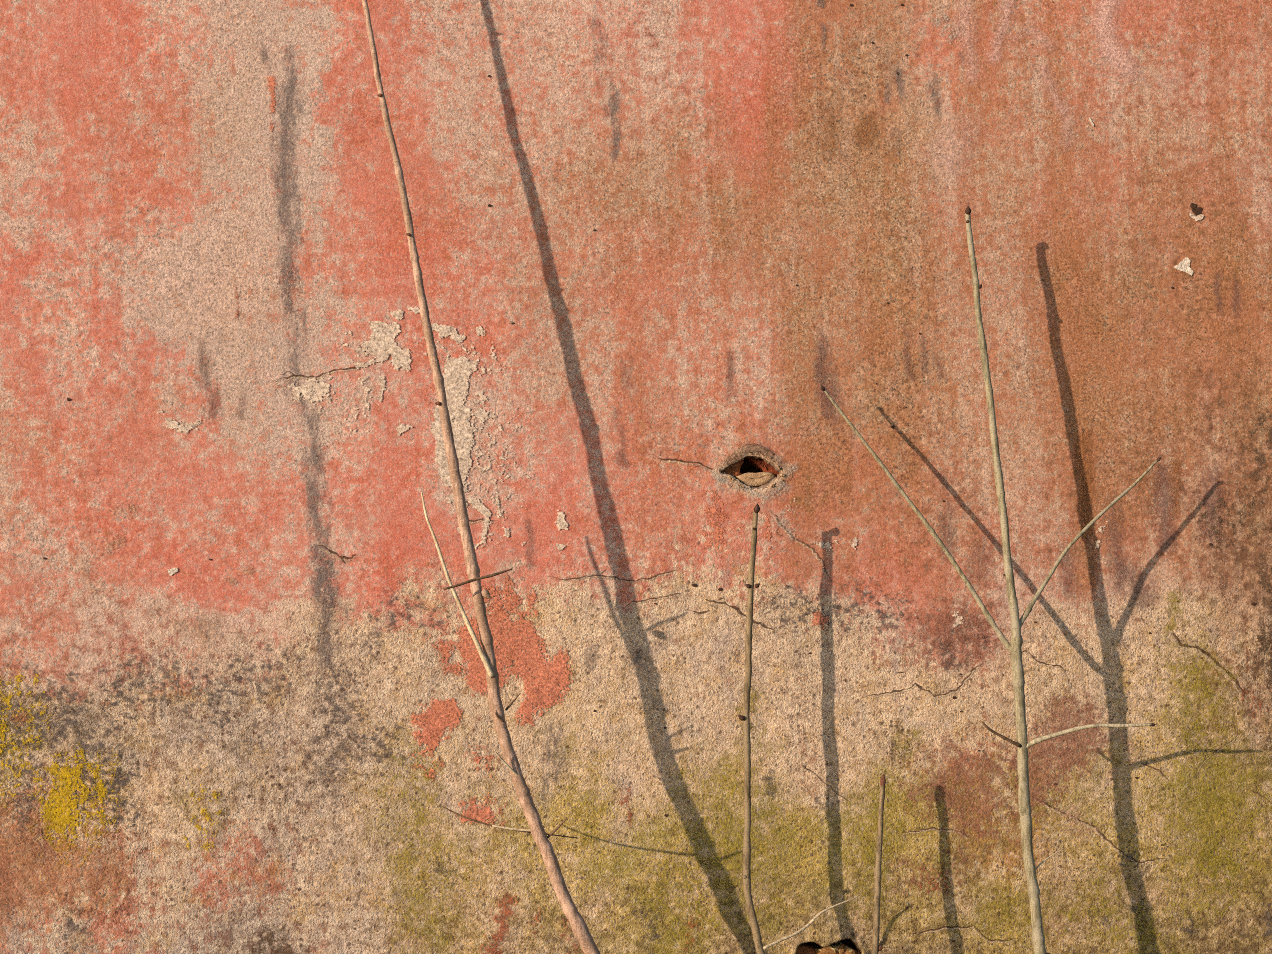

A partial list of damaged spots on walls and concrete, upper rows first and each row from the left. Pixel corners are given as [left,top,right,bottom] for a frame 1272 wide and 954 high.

damp [271,53,307,390]
peeling [287,306,530,553]
spalling [713,451,797,536]
peeling [816,537,857,551]
damp [1194,409,1272,684]
damp [301,401,413,804]
damp [361,590,450,657]
damp [762,769,781,799]
damp [874,720,924,768]
spalling [788,930,870,954]